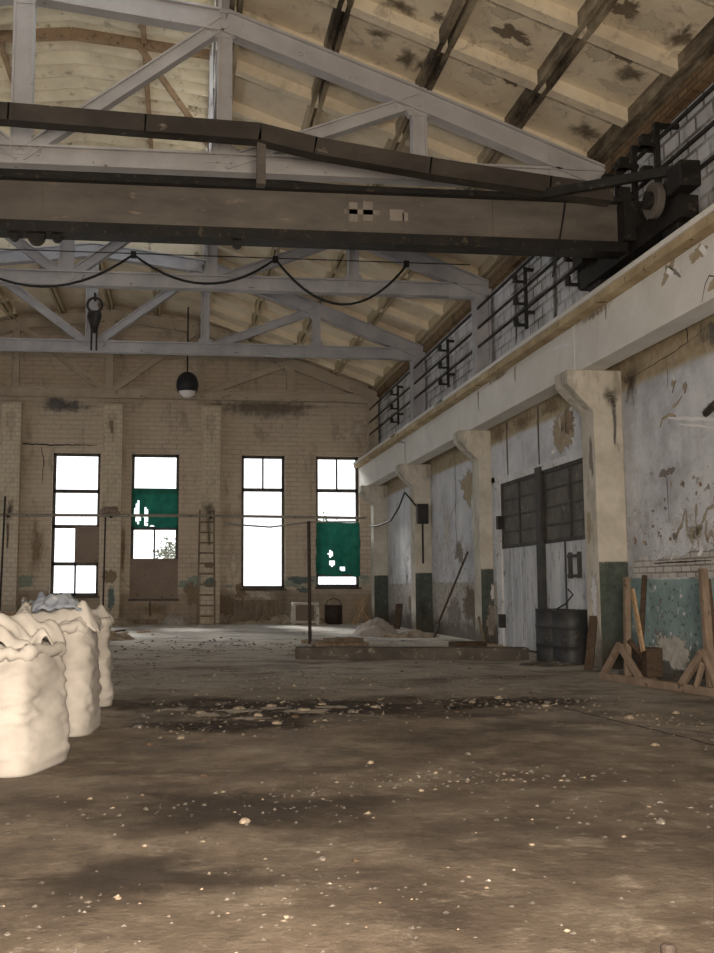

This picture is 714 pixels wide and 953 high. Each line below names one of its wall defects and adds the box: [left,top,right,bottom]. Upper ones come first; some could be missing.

damp [671,29,691,45]
damp [619,66,640,79]
damp [577,125,598,138]
spalling [668,375,714,429]
peeling [550,406,576,454]
flaking render [633,467,714,672]